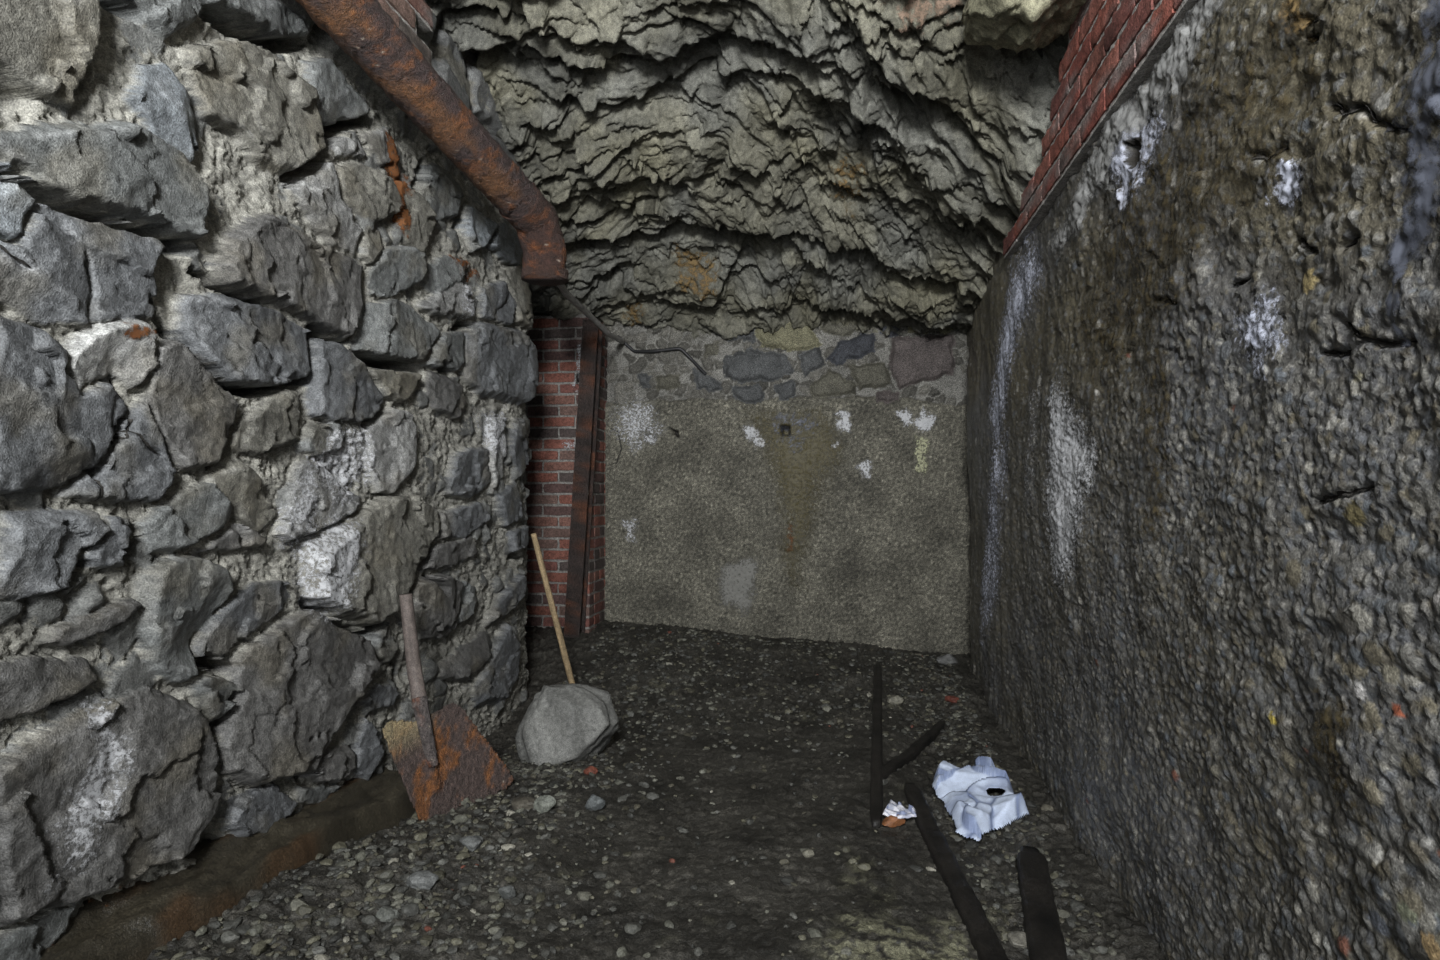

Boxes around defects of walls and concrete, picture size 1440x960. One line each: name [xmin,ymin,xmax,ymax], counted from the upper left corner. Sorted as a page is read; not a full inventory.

corrosion [384,129,413,237]
damp [1025,0,1330,599]
damp [741,402,852,591]
damp [857,460,871,478]
damp [896,409,936,473]
damp [979,229,1044,661]